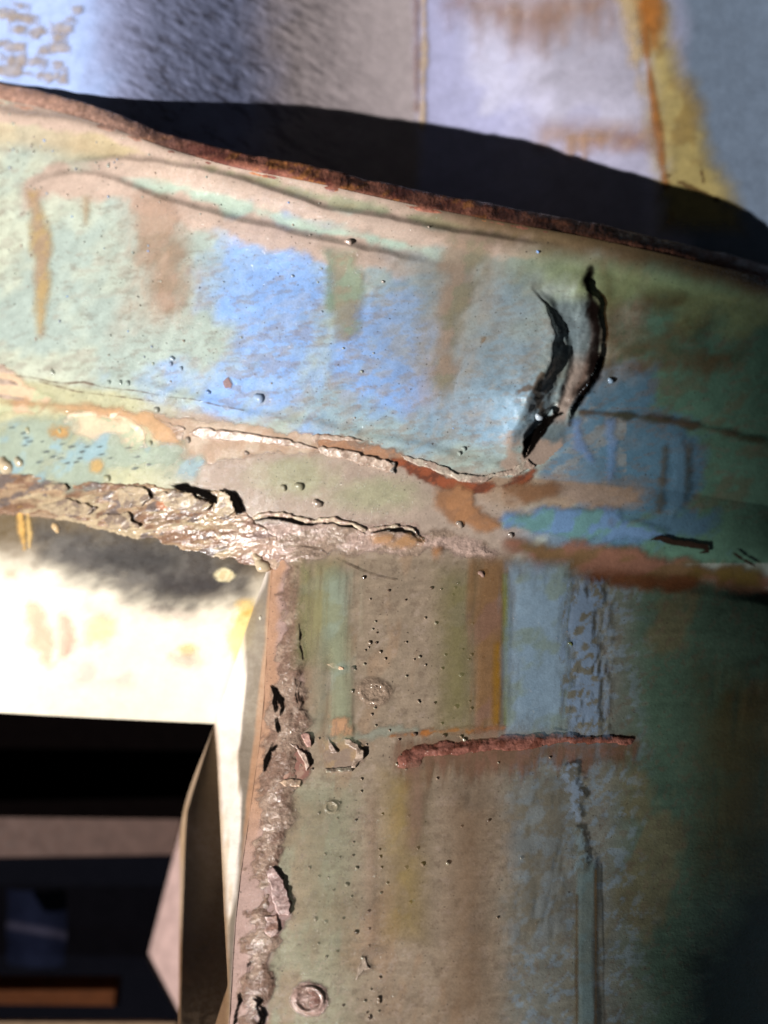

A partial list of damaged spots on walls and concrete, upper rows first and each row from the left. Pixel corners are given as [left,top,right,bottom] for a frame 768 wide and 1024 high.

rust [29,193,50,333]
peeling [41,483,140,530]
peeling [152,488,235,518]
rust [436,485,499,531]
rust [509,485,557,502]
rust [373,536,415,548]
rust [505,540,768,595]
crack [651,536,756,566]
damp [509,570,605,732]
peeling [263,867,293,938]
damp [561,763,596,1024]